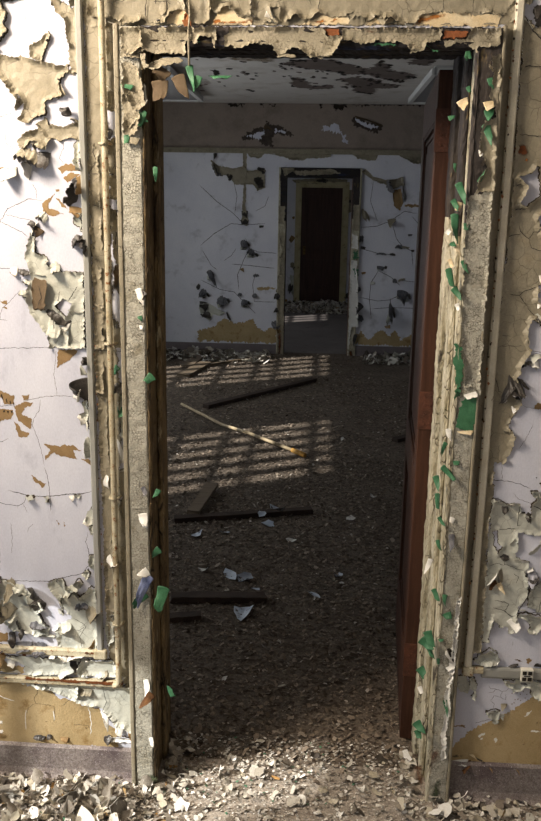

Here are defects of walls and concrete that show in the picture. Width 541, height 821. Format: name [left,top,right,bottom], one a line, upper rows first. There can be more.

crack [0,322,121,582]
peeling [0,0,170,747]
crack [202,188,276,314]